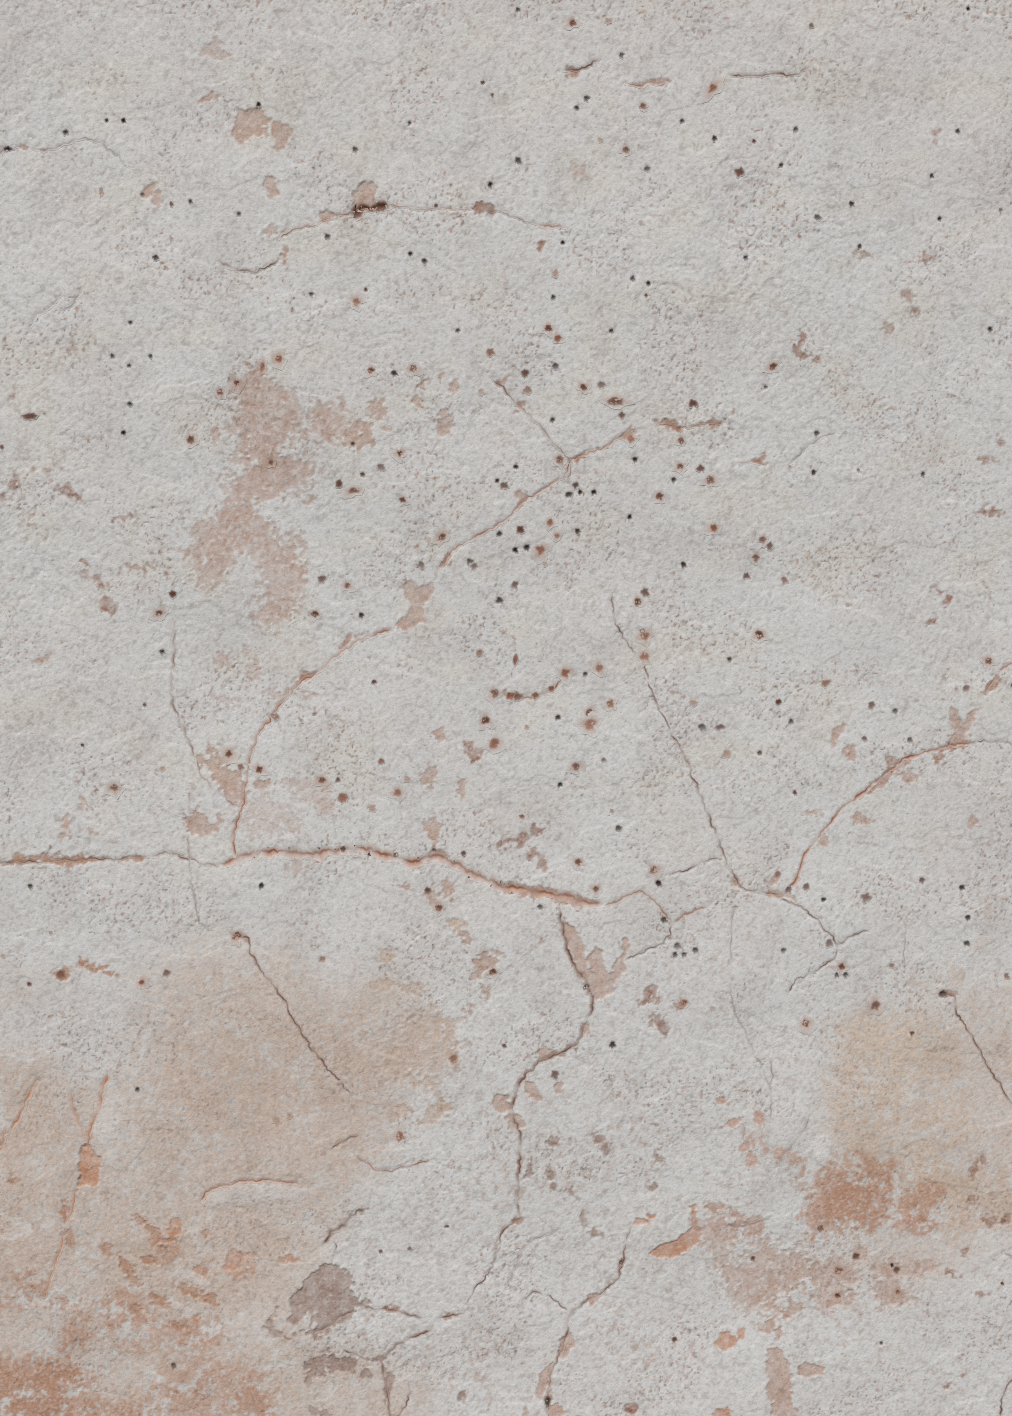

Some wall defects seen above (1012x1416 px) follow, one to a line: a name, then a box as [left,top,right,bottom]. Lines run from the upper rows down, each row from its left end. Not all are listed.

peeling [189,86,295,153]
crack [436,370,729,570]
crack [737,431,840,466]
leakage [0,896,462,1416]
crack [0,592,1012,1416]
peeling [520,1133,605,1242]
peeling [589,1131,617,1159]
peeling [644,1147,665,1194]
leakage [779,829,1012,1307]
peeling [961,1155,1012,1231]
spalling [96,1212,375,1416]
peeling [647,1199,970,1416]